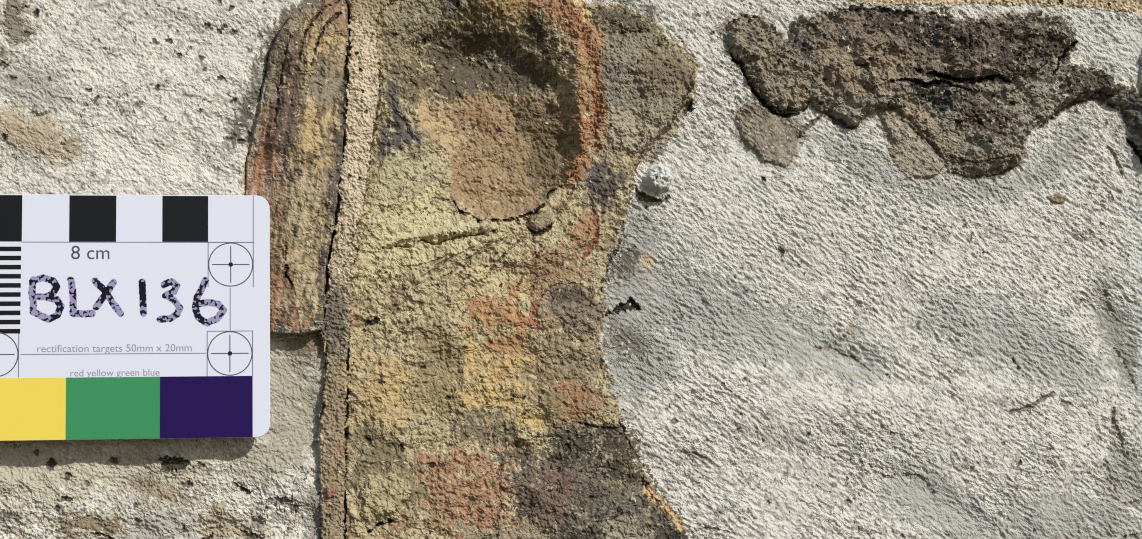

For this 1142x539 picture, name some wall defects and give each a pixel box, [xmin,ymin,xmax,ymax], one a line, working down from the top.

peeling [529,210,554,231]
spalling [582,0,1142,539]
crack [1008,359,1073,414]
peeling [358,472,409,529]